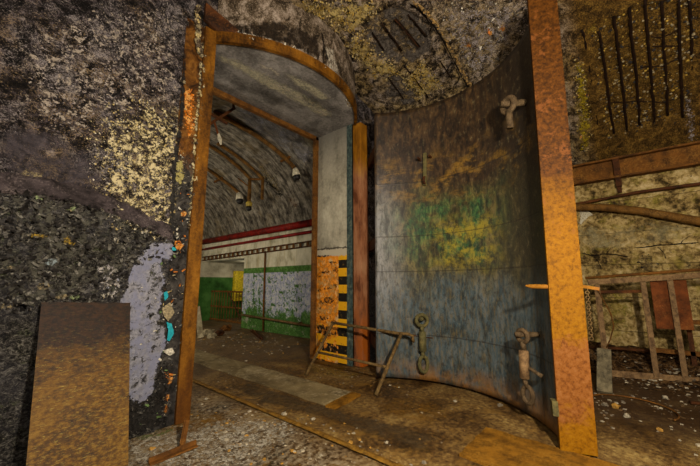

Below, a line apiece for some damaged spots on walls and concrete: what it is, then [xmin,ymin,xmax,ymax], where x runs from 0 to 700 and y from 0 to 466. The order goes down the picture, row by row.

peeling [247,269,307,337]
peeling [316,255,339,346]